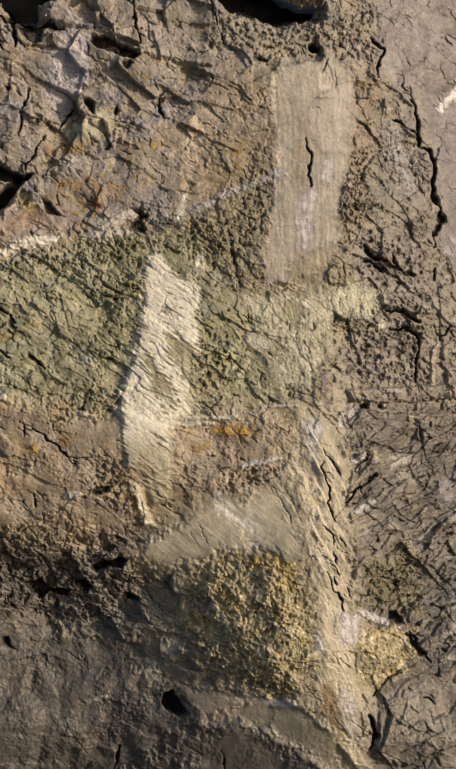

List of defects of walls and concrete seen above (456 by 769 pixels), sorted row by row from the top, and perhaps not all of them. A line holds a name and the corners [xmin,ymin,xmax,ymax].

crack [0,8,63,50]
crack [127,0,141,44]
hole [226,0,317,28]
crack [18,90,30,136]
crack [156,95,164,118]
crack [20,110,74,173]
crack [305,139,313,187]
crack [392,80,445,247]
crack [363,245,413,277]
crack [385,308,450,387]
crack [23,424,89,465]
crack [320,449,384,609]